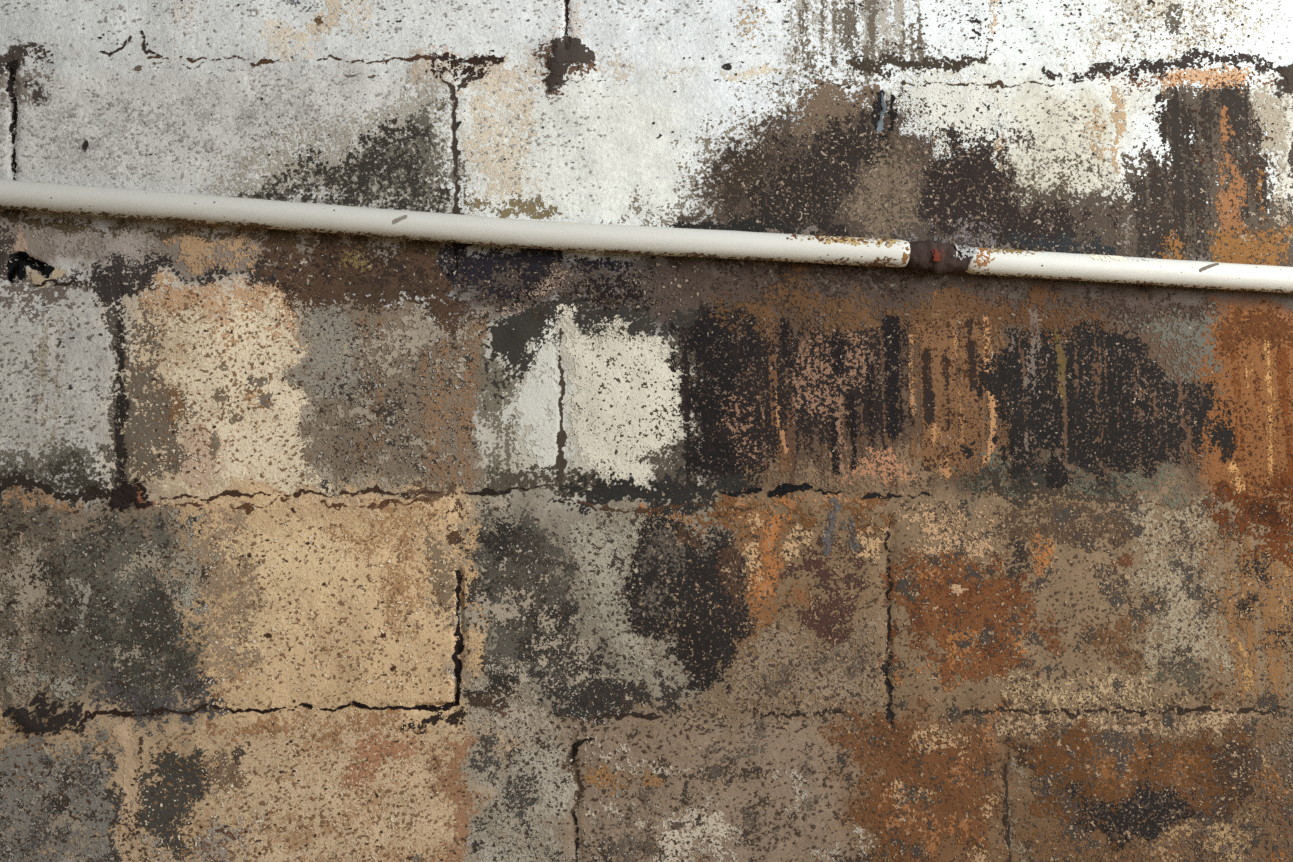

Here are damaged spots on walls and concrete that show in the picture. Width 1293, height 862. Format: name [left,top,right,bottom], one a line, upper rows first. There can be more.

crack [6,59,19,180]
crack [101,30,487,277]
leakage [169,50,563,220]
crack [715,8,1084,138]
corrosion [1080,63,1293,266]
leakage [0,209,279,862]
corrosion [0,210,583,679]
crack [76,570,533,728]
crack [161,328,932,724]
leakage [302,235,1293,862]
corrosion [818,289,1293,862]
crack [963,705,1293,862]